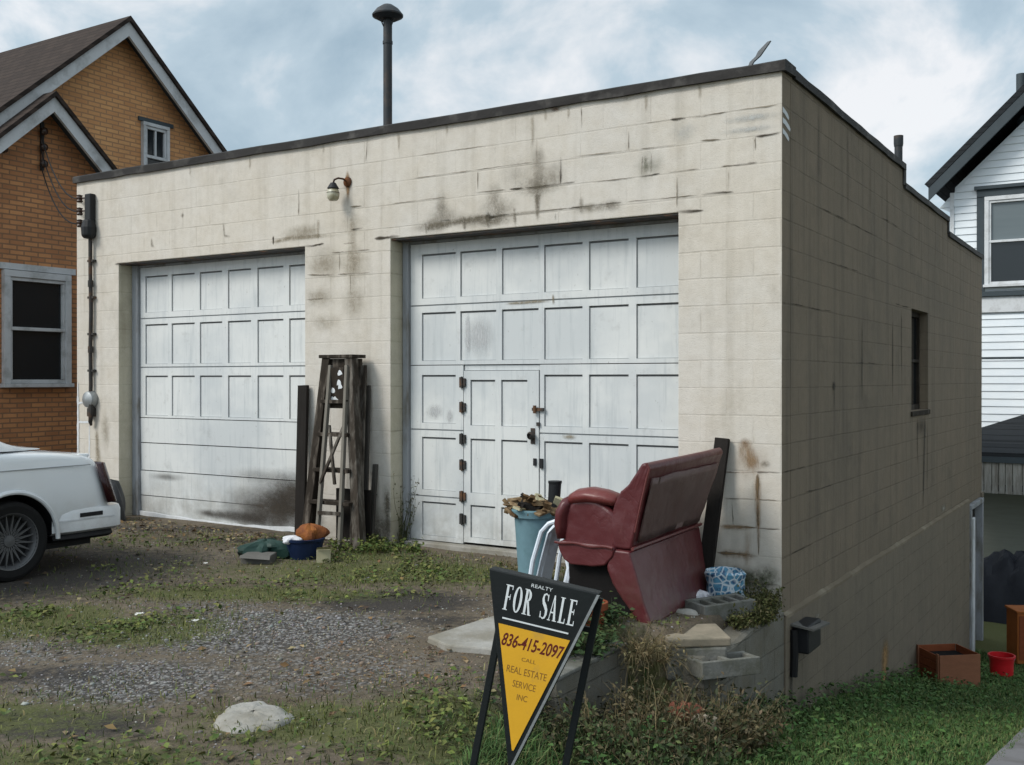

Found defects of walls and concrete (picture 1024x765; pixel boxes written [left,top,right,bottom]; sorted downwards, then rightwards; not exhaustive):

leakage [428,216,498,228]